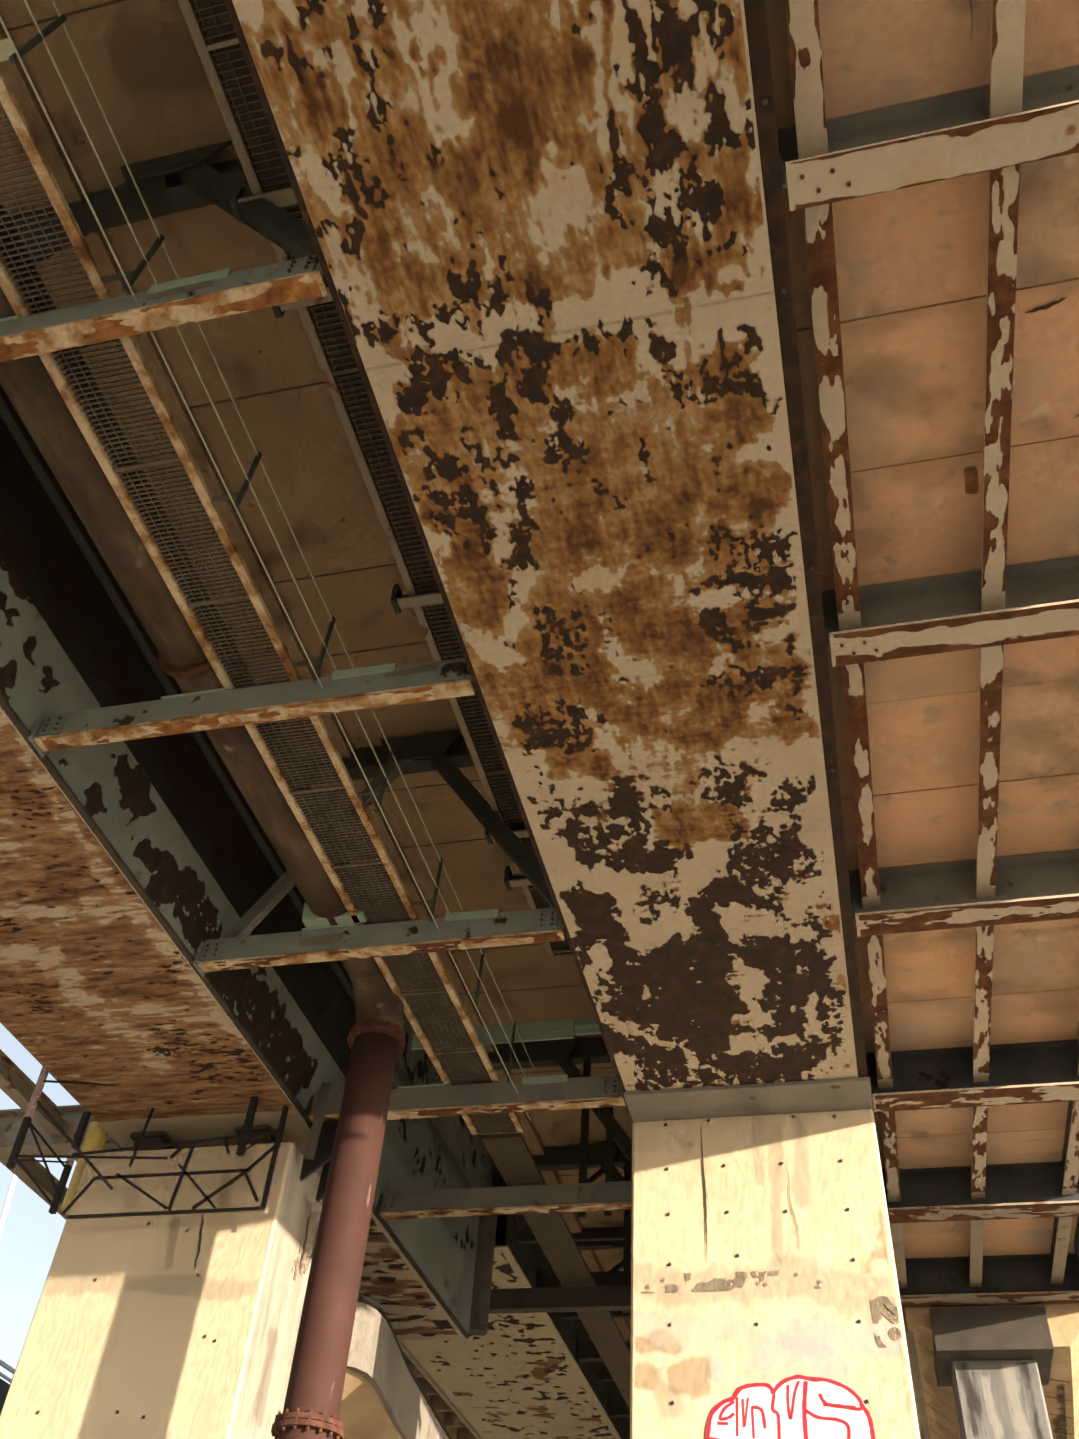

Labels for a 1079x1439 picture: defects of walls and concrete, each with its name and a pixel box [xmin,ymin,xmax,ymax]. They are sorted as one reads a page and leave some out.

corrosion [785,0,827,128]
corrosion [0,329,47,362]
corrosion [56,0,819,897]
peeling [0,636,60,703]
peeling [84,734,266,998]
corrosion [0,687,433,1122]
peeling [512,699,846,1091]
peeling [144,966,317,1100]
crack [700,1136,708,1263]
crack [787,1158,800,1251]
corrosion [357,1218,458,1335]
spalling [642,1270,798,1293]